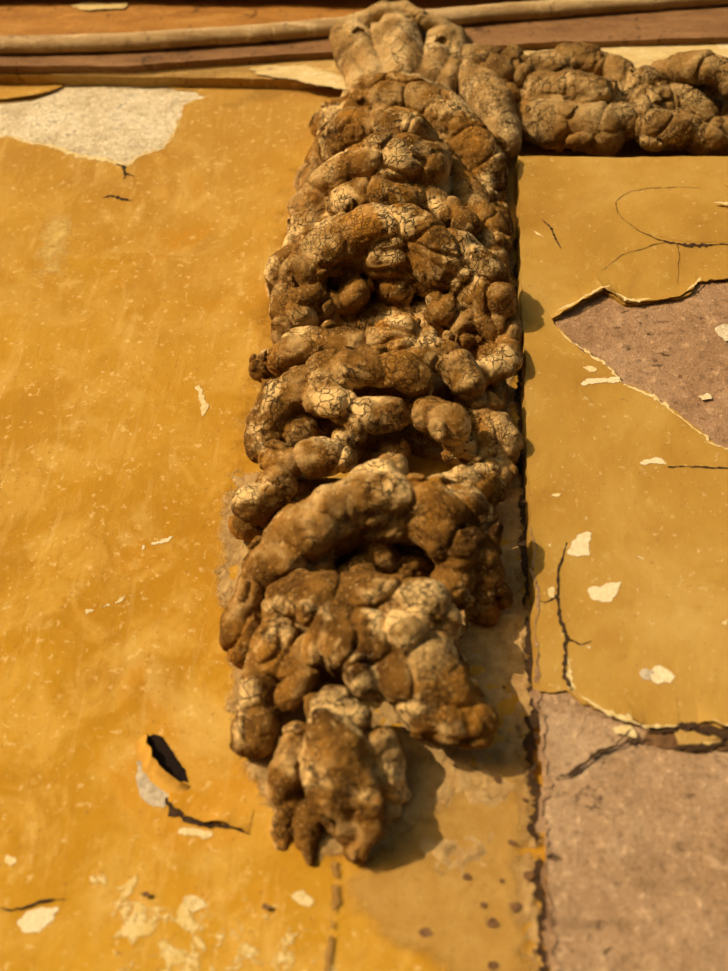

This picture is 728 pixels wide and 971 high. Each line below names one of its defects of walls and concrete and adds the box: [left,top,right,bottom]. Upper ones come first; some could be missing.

peeling [601,43,728,68]
peeling [0,84,205,166]
crack [513,220,561,310]
crack [603,187,728,282]
spalling [543,266,728,450]
crack [668,463,728,471]
crack [513,367,650,971]
peeling [134,734,254,840]
spalling [523,527,728,971]
peeling [0,898,66,933]
peeling [89,875,302,971]
peeling [292,890,314,907]